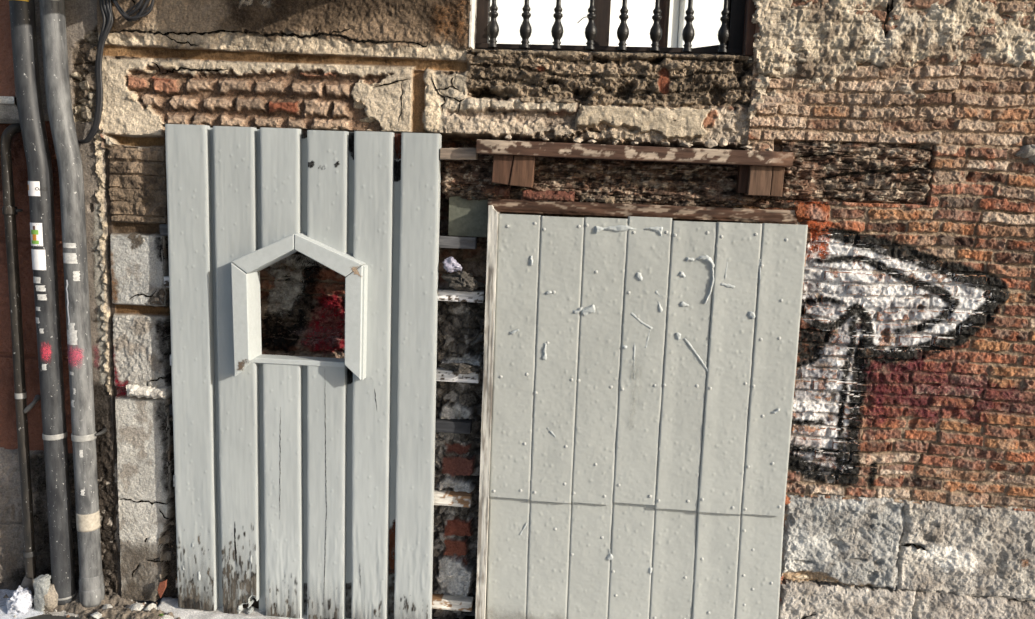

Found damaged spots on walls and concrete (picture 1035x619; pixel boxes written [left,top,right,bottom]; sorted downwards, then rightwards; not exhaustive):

crack [110,0,431,74]
spalling [127,64,382,132]
crack [119,498,171,519]